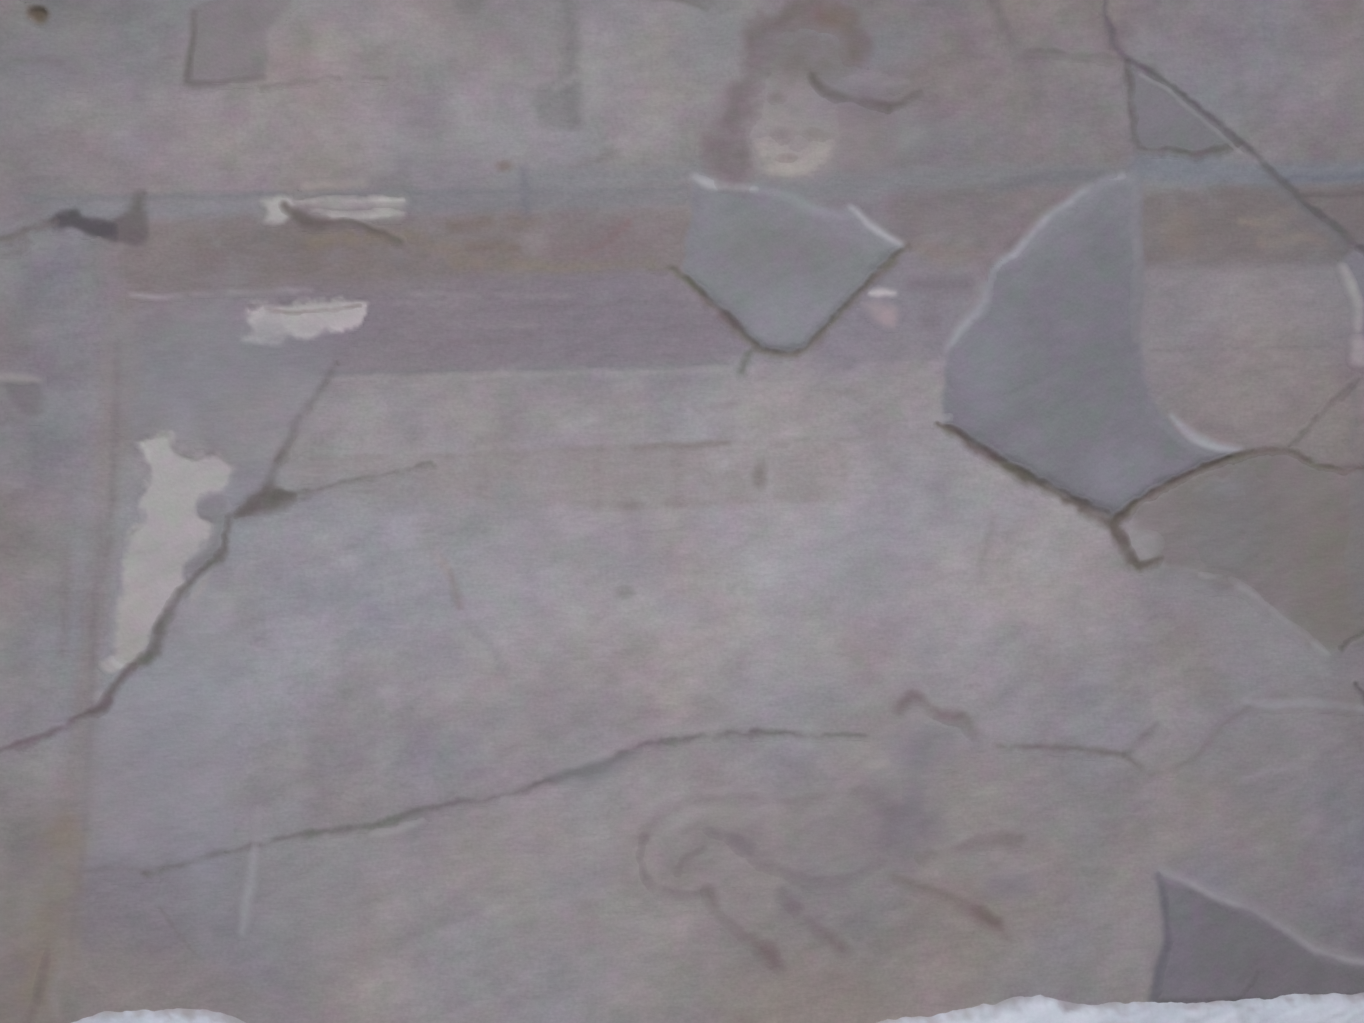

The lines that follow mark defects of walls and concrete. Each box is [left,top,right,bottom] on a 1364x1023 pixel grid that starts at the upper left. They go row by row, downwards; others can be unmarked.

crack [982,0,1364,260]
peeling [257,176,413,248]
peeling [243,294,371,334]
crack [932,372,1363,575]
peeling [84,430,234,704]
crack [0,360,439,756]
crack [1338,629,1364,706]
crack [223,723,870,858]
crack [991,706,1255,782]